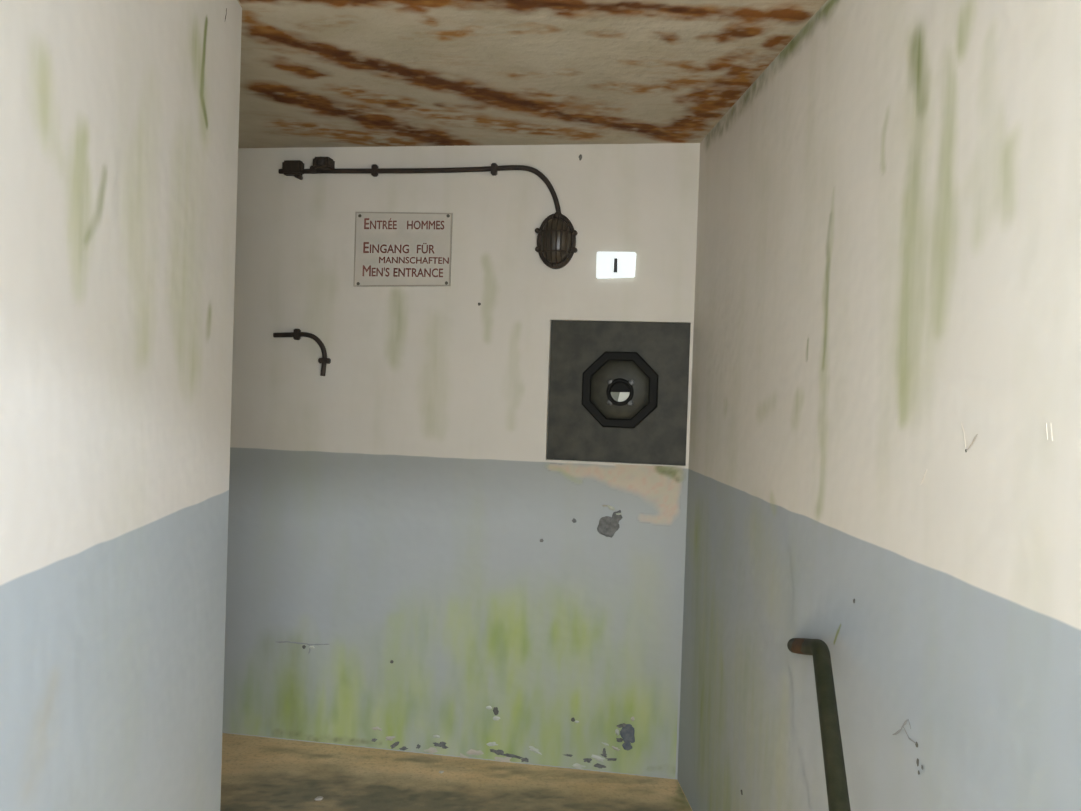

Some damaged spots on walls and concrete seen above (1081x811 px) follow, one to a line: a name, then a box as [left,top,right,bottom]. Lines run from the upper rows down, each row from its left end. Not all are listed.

corrosion [239,0,817,147]
leakage [805,207,834,376]
leakage [878,0,1028,444]
spalling [597,505,622,538]
peeling [542,461,686,527]
leakage [220,606,676,811]
peeling [372,726,542,763]
leakage [435,540,682,731]
spalling [565,717,635,770]